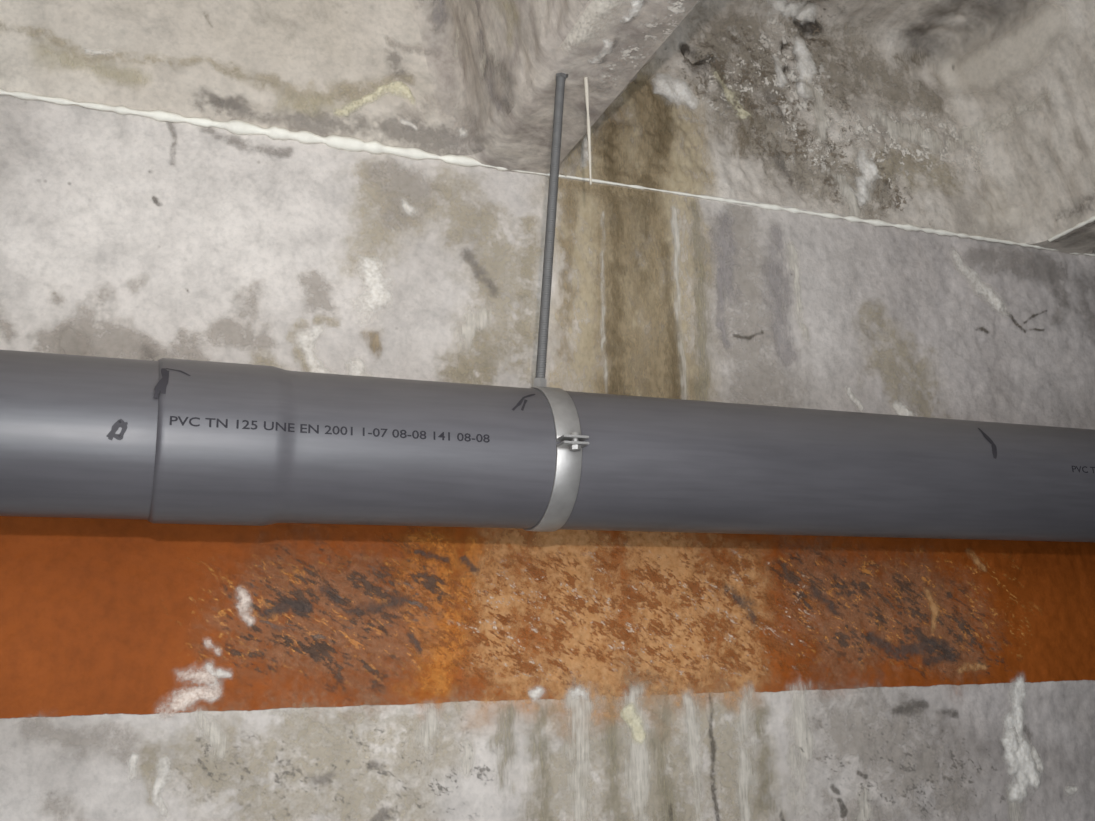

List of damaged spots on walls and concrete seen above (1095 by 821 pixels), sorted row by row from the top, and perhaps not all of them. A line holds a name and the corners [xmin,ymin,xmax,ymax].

water stain [597,0,1049,217]
water stain [189,549,465,697]
water stain [567,688,591,821]
water stain [606,688,676,821]
water stain [684,695,719,821]
water stain [738,688,768,821]
efflorescence [1002,677,1043,821]